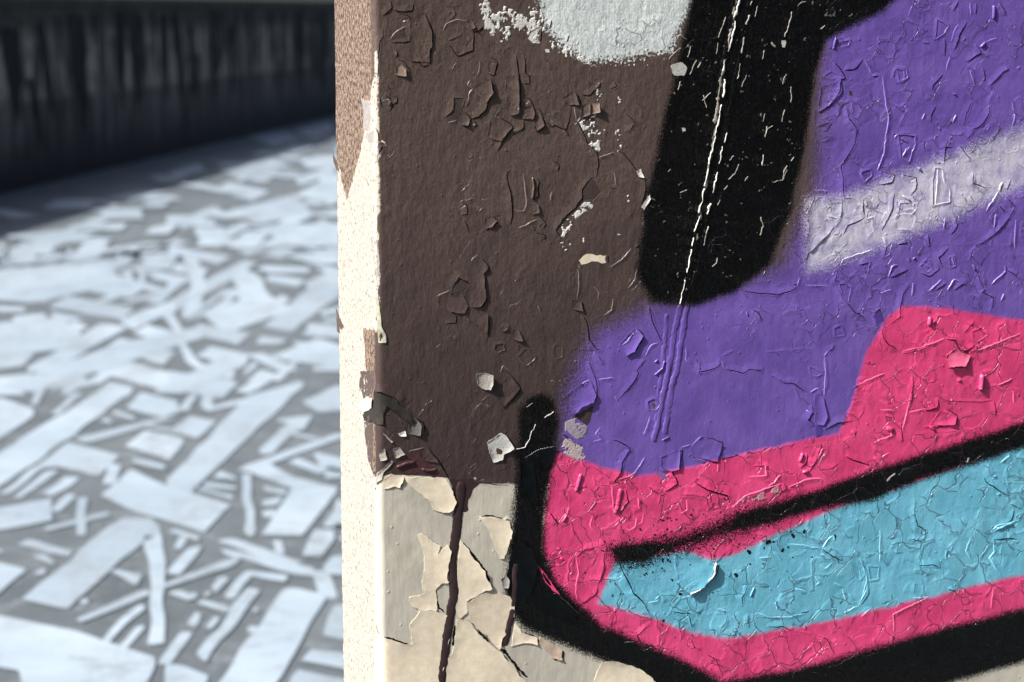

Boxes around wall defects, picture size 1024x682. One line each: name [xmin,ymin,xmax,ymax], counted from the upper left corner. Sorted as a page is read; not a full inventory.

peeling [381,0,659,355]
crack [738,65,1021,356]
peeling [357,370,457,513]
peeling [487,433,515,463]
crack [547,305,857,435]
peeling [375,515,609,682]
crack [474,403,724,676]
peeling [592,653,655,682]
peeling [675,557,719,594]
crack [735,585,836,656]
crack [787,512,843,562]
crack [879,492,972,640]